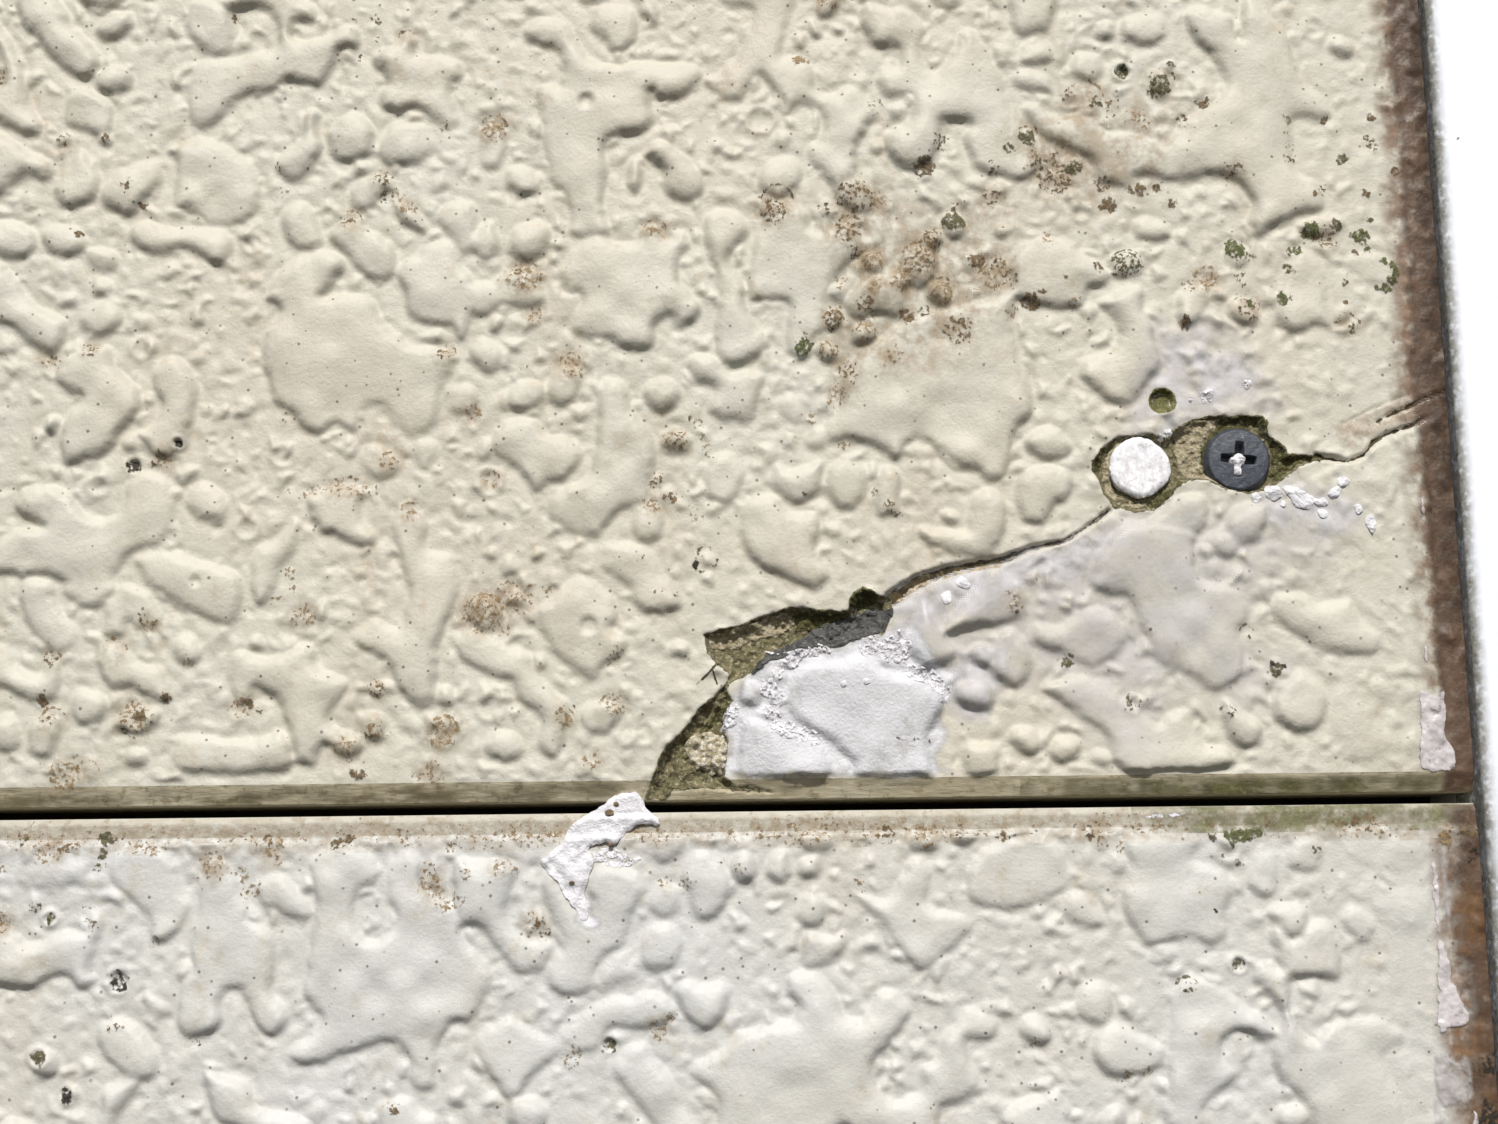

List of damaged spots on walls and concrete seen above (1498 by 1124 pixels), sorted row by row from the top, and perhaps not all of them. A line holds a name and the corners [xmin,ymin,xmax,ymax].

crack [1313,392,1446,462]
spalling [1091,415,1350,519]
peeling [1354,504,1377,534]
peeling [941,576,971,604]
crack [886,510,1109,606]
crack [697,663,718,685]
peeling [541,586,959,929]